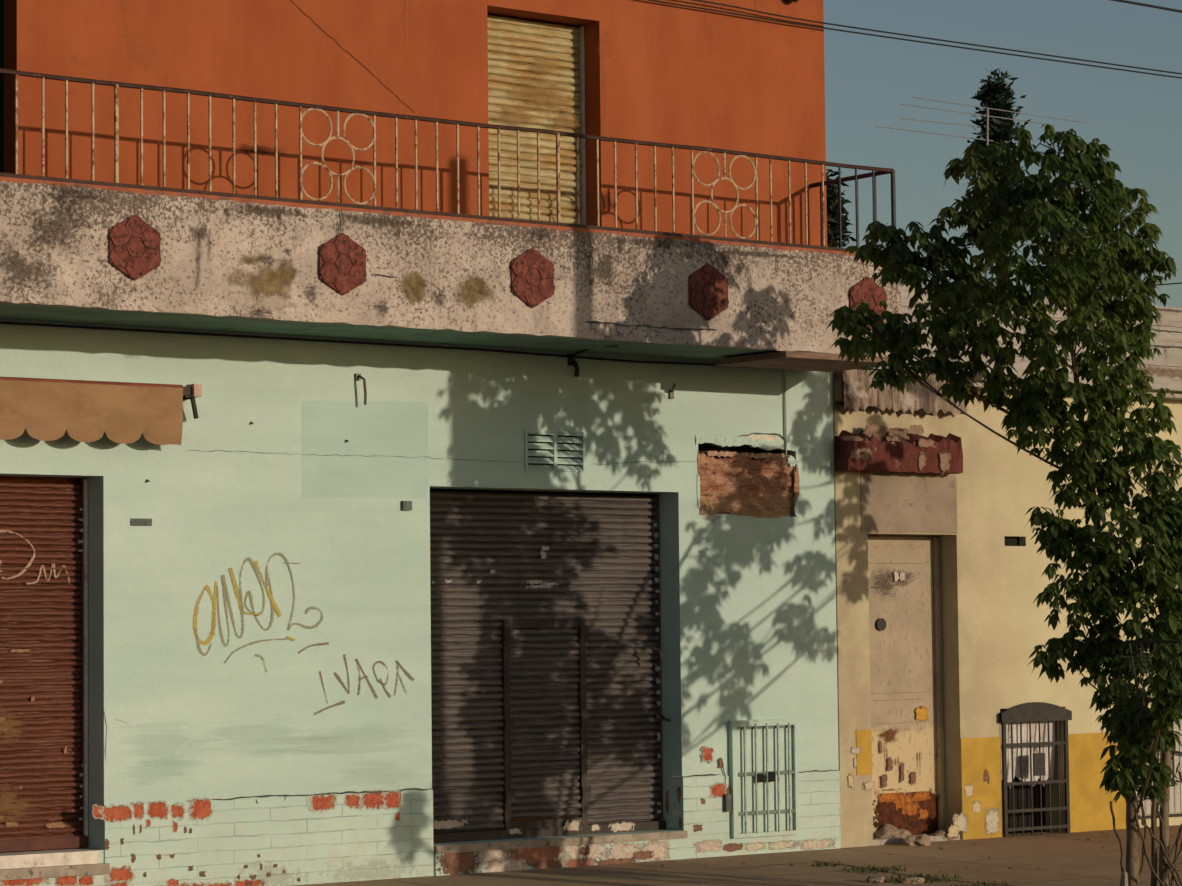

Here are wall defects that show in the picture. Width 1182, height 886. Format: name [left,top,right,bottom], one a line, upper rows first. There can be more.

water stain [0,183,107,291]
water stain [192,227,211,283]
water stain [225,205,318,229]
water stain [338,214,420,239]
water stain [230,248,296,320]
water stain [402,272,493,307]
flaking render [695,433,800,518]
spalling [841,424,951,475]
peeling [0,764,300,886]
peeling [307,788,405,821]
peeling [433,819,670,875]
peeling [656,779,836,853]